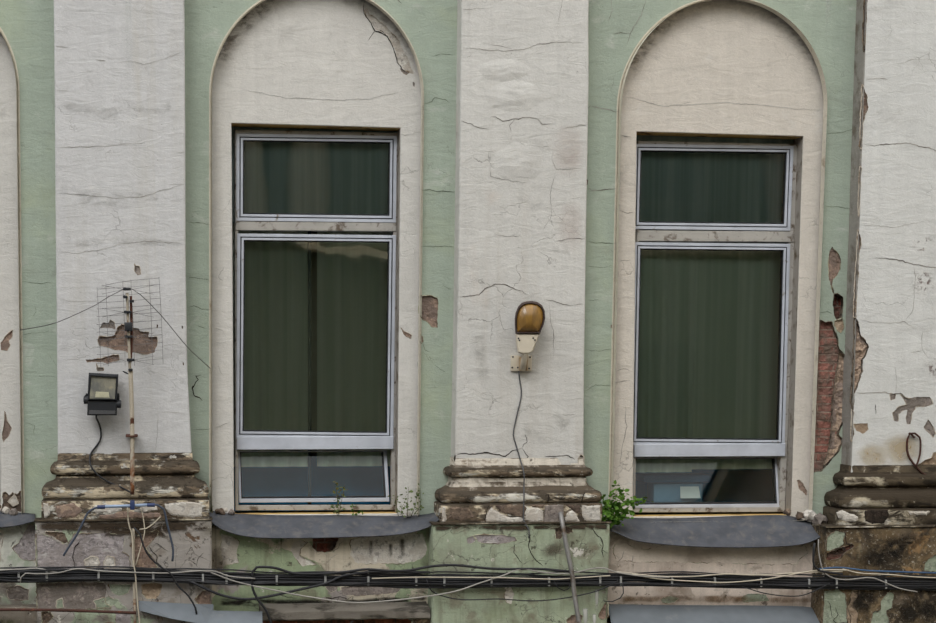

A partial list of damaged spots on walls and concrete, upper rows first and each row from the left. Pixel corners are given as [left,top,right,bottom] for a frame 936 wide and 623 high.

crack [236,5,405,101]
crack [472,42,583,51]
crack [443,284,594,348]
crack [863,258,936,356]
spalling [86,319,158,371]
flaking render [811,229,869,472]
crack [860,369,907,410]
spalling [889,393,933,424]
crack [454,435,574,461]
peeling [93,502,202,519]
spalling [0,524,158,569]
spalling [821,589,860,623]